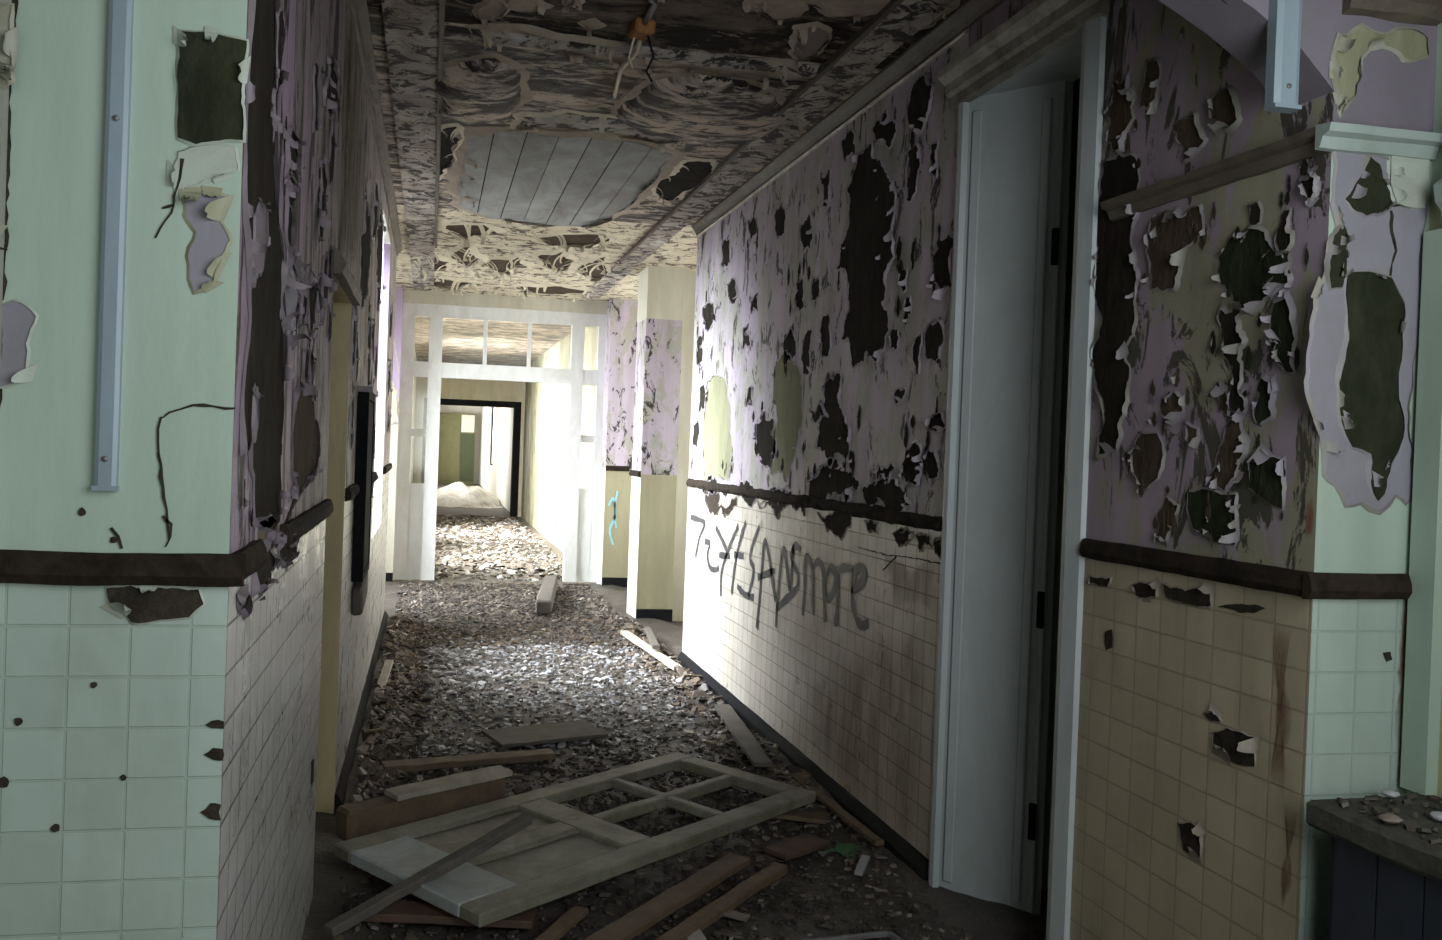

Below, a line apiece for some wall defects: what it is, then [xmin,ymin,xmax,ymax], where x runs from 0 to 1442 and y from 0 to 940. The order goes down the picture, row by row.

peeling [1329,22,1430,119]
peeling [166,0,400,621]
spalling [402,123,617,302]
peeling [693,71,946,559]
peeling [926,223,953,300]
peeling [1090,57,1430,548]
crack [1389,204,1412,276]
crack [157,403,235,547]
crack [110,527,123,549]
spalling [100,585,206,626]
spalling [1203,702,1260,768]
spalling [1178,819,1207,865]